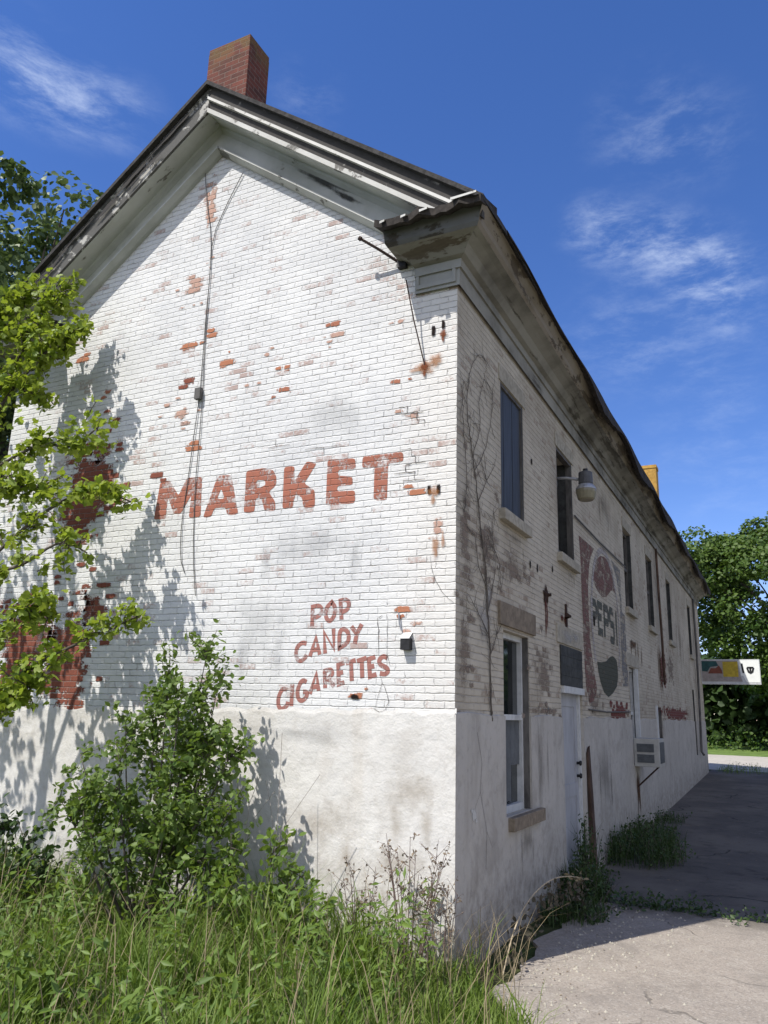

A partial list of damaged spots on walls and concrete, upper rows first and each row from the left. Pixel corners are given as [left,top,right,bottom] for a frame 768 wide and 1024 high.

peeling [35,110,190,284]
peeling [205,174,218,228]
peeling [176,256,215,309]
peeling [180,328,217,351]
rust [411,355,440,376]
peeling [55,389,130,558]
peeling [0,562,115,710]